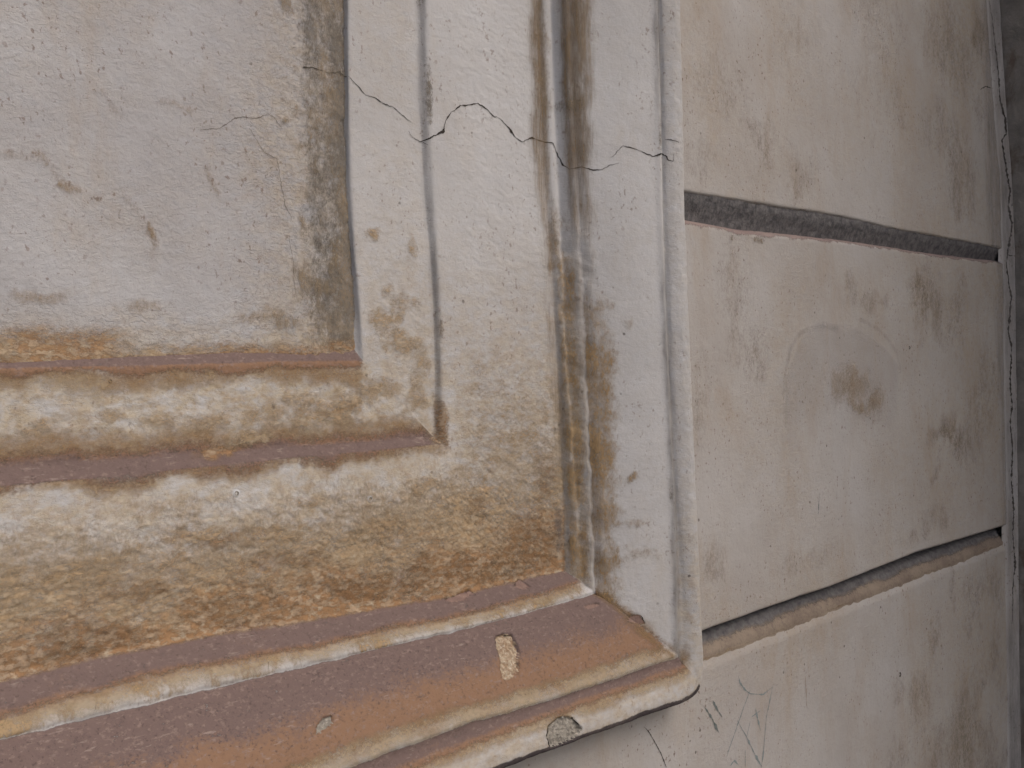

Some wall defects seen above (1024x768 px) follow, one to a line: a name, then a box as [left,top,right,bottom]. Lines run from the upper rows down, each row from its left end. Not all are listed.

crack [303,66,677,171]
damp [531,0,548,197]
damp [561,0,588,182]
crack [980,3,1016,620]
damp [0,401,449,478]
damp [586,338,631,617]
damp [0,583,580,738]
spalling [495,634,520,680]
spalling [546,716,583,747]